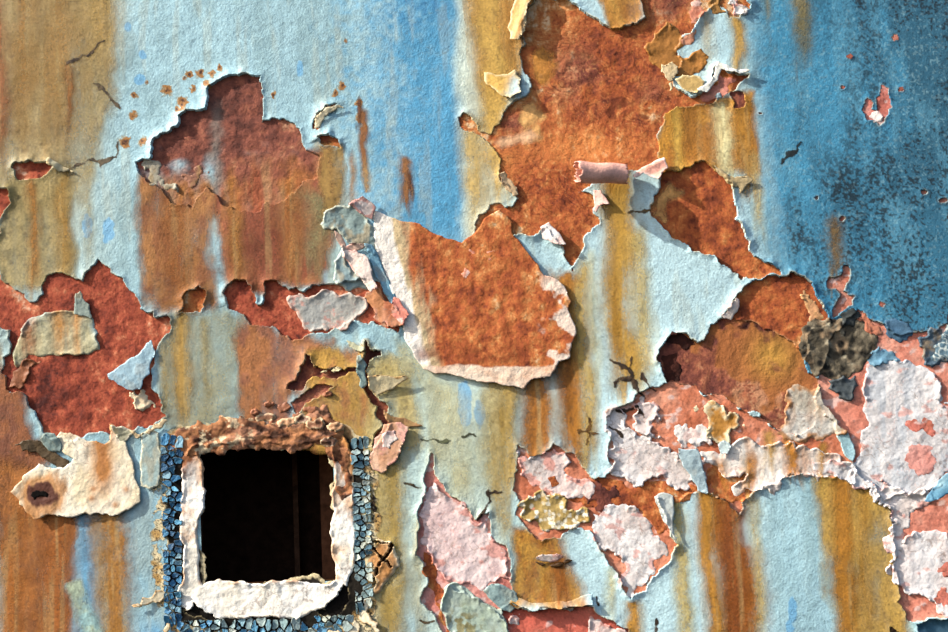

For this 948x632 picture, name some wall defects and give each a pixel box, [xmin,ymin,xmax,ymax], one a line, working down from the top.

crack [66,40,105,64]
crack [70,141,119,170]
crack [93,82,121,109]
peeling [313,104,377,292]
corrosion [0,0,419,632]
corrosion [459,0,828,610]
crack [577,356,657,445]
peeling [513,265,948,632]
peeling [416,453,628,632]
corrosion [674,502,692,632]
corrosion [698,491,763,632]
corrosion [815,476,907,632]